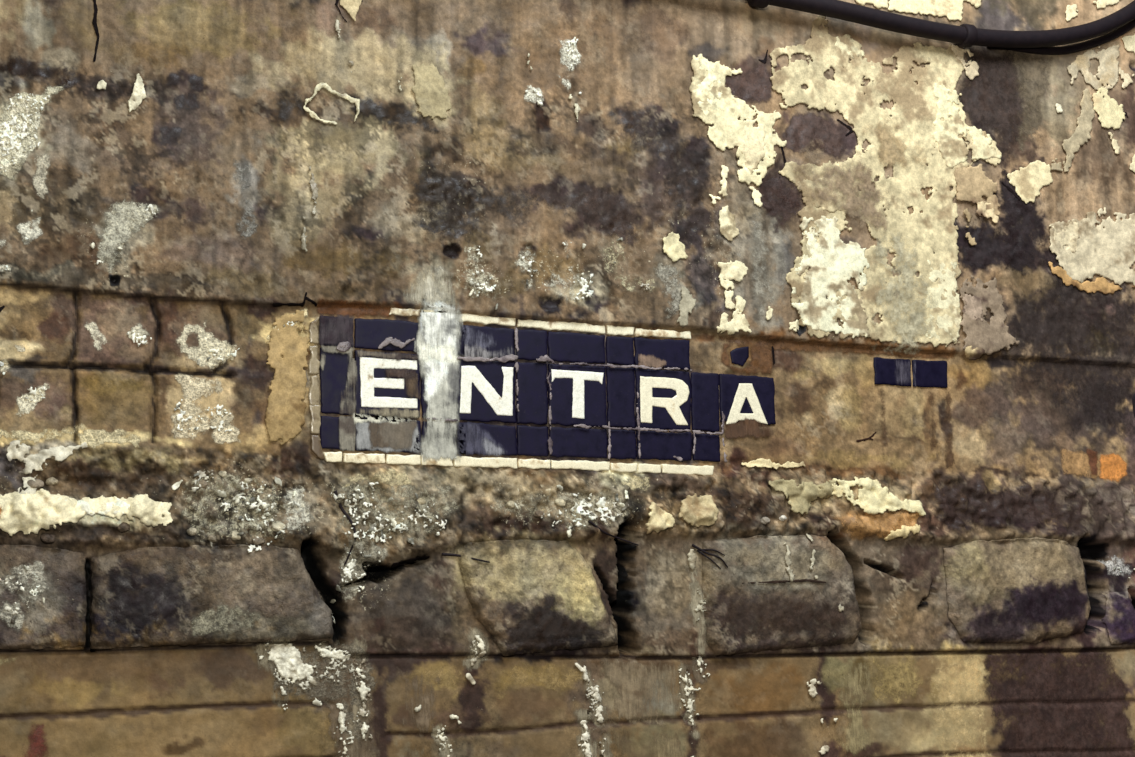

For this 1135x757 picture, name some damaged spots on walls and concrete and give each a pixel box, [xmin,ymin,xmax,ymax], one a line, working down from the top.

crack [91,0,99,62]
peeling [1065,4,1078,21]
peeling [1093,0,1119,9]
peeling [689,16,1135,360]
peeling [0,440,173,536]
damp [317,469,457,624]
crack [363,556,430,578]
peeling [741,458,926,541]
damp [268,640,380,757]
damp [403,635,486,753]
damp [498,657,710,757]
damp [821,649,1135,757]